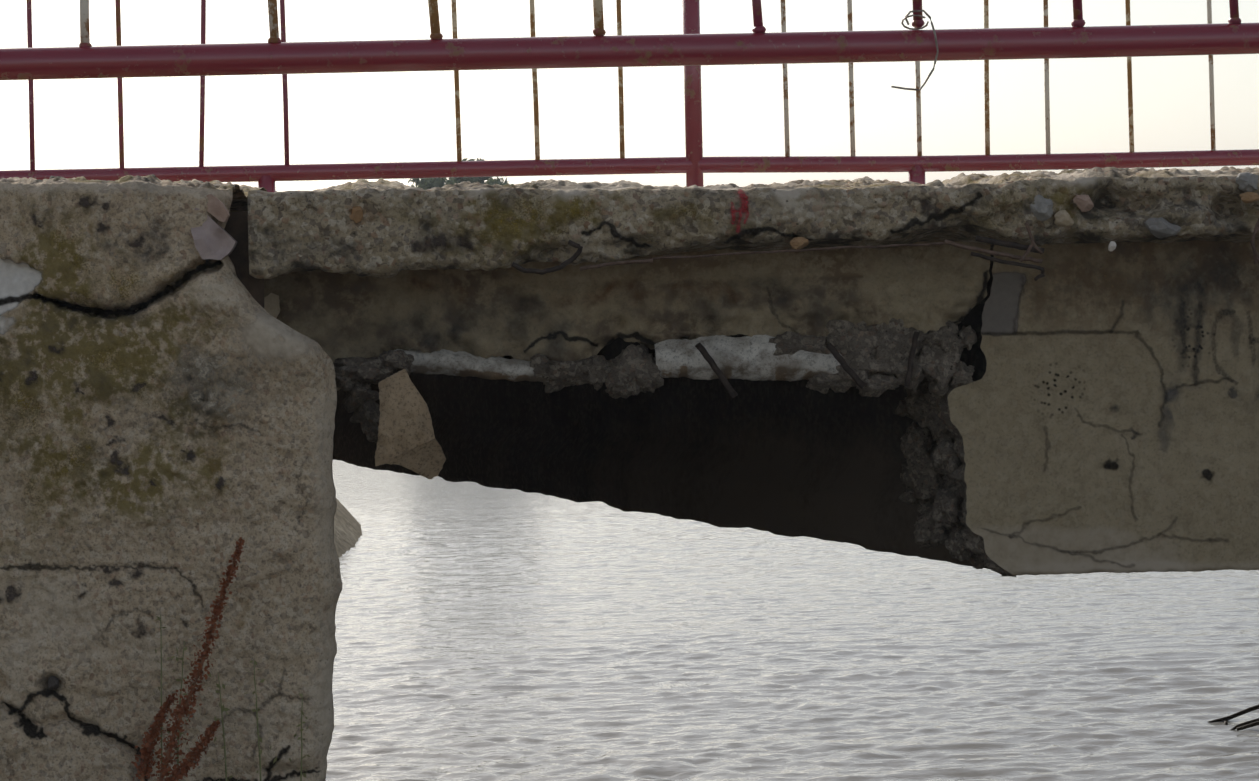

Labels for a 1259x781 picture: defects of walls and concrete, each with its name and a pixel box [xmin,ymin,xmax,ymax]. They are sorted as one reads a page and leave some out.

spalling [0,258,42,334]
crack [0,259,222,318]
crack [948,271,1232,426]
spalling [394,318,1016,577]
crack [3,689,148,781]